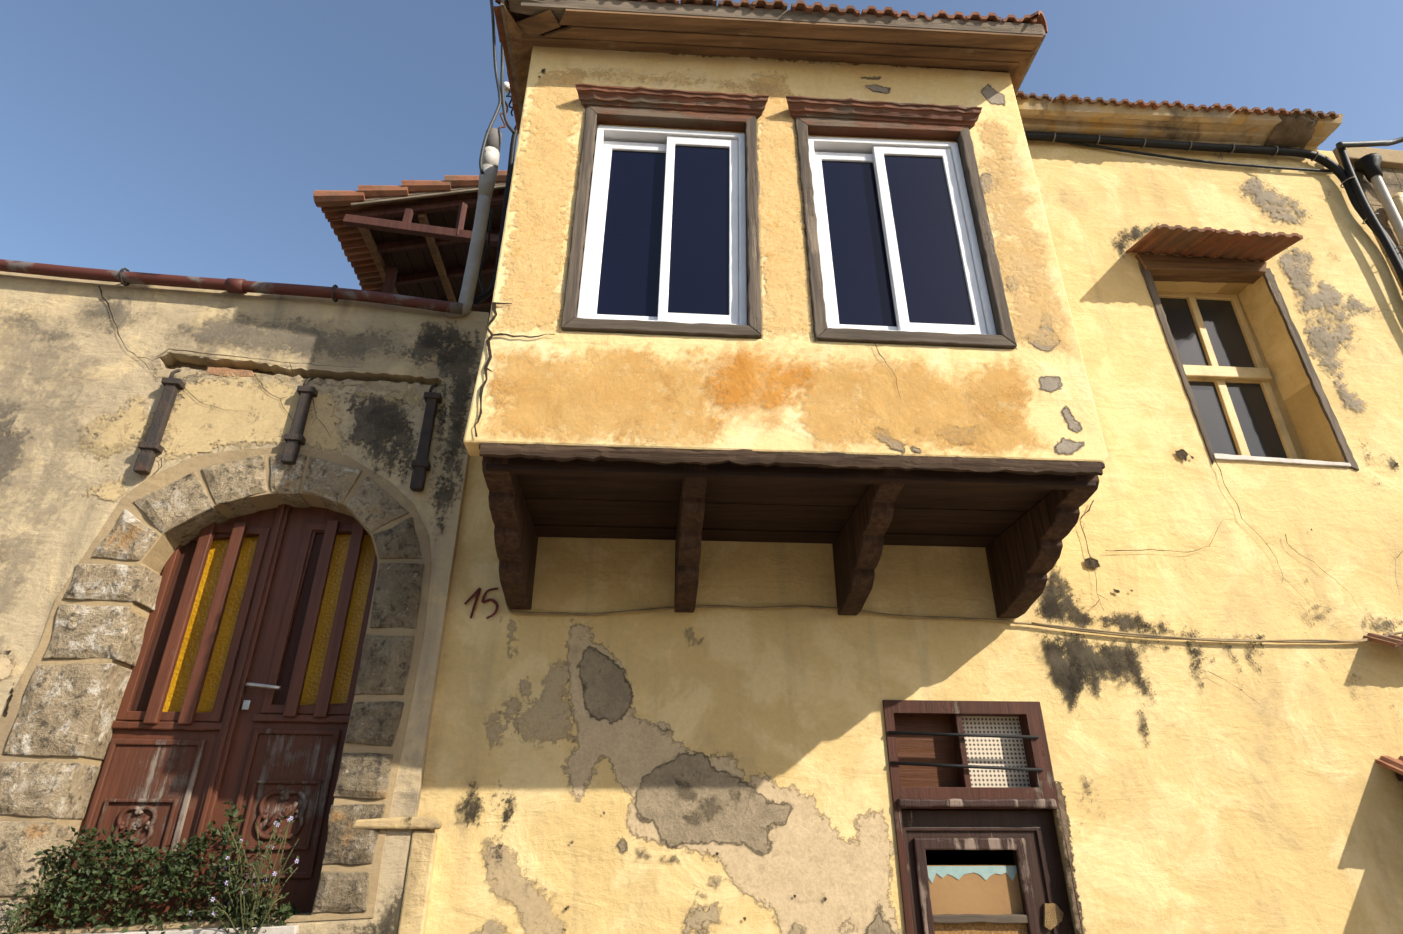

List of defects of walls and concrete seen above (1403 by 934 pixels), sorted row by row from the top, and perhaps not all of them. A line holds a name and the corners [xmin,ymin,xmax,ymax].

peeling [978,84,1074,352]
leakage [1113,223,1160,256]
leakage [0,399,33,487]
leakage [4,313,69,355]
leakage [79,299,142,334]
crack [98,286,359,437]
leakage [169,315,480,541]
peeling [1039,376,1085,455]
crack [1079,458,1363,614]
mould [1036,564,1265,745]
mould [1359,615,1403,633]
peeling [469,619,904,934]